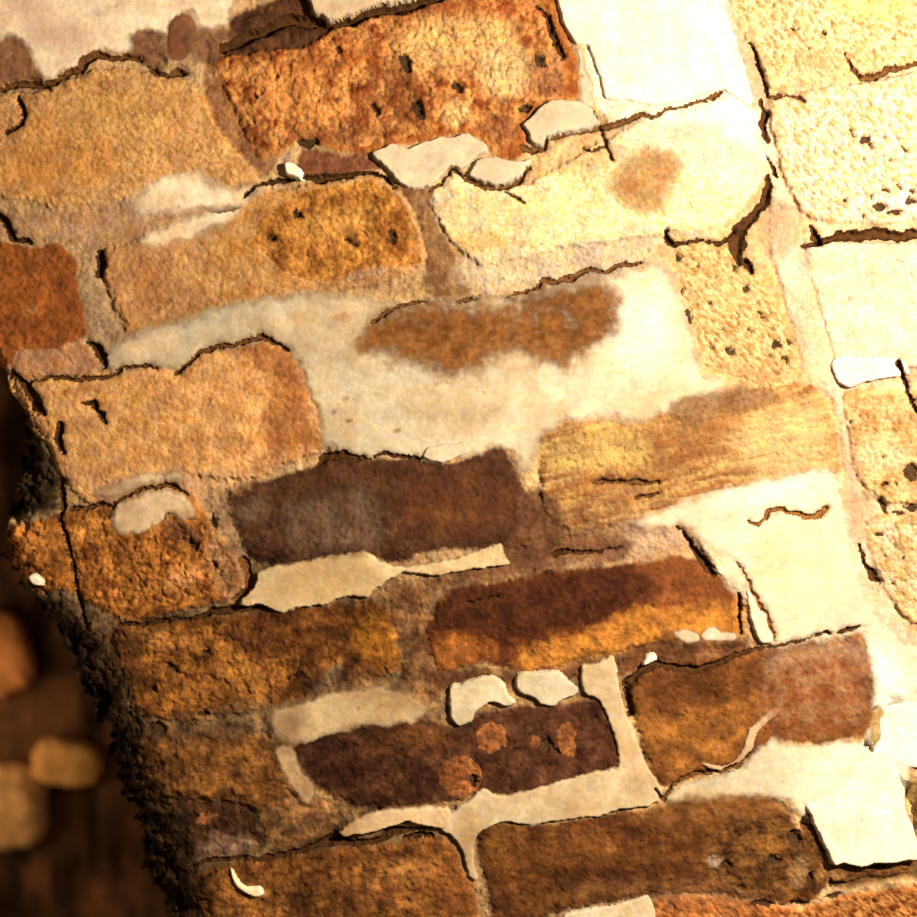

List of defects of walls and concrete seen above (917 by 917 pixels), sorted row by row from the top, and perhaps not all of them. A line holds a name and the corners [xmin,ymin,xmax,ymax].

crack [0,50,189,135]
spalling [219,0,917,283]
crack [428,91,723,204]
crack [664,42,805,275]
crack [844,51,917,82]
crack [801,224,917,249]
leakage [360,284,622,376]
crack [11,333,290,455]
crack [747,505,830,527]
peeling [272,687,427,802]
peeling [338,468,917,917]
crack [622,561,861,717]